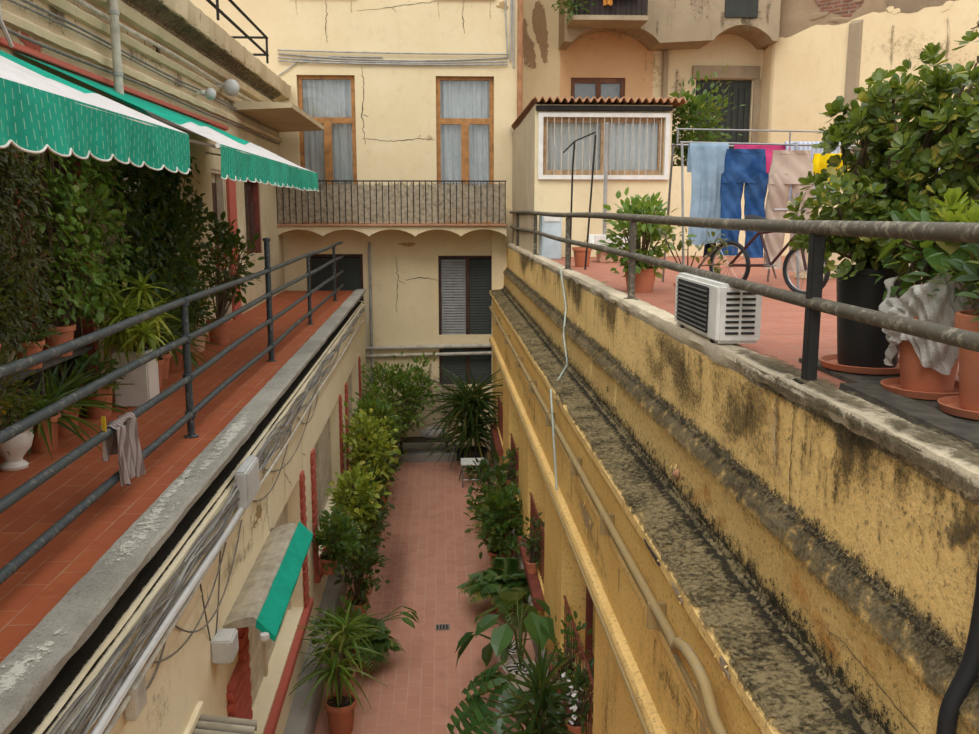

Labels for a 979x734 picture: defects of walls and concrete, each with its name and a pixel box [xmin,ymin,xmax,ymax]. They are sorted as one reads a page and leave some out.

flaking render [809,0,864,24]
leakage [503,252,979,702]
leakage [959,674,979,734]